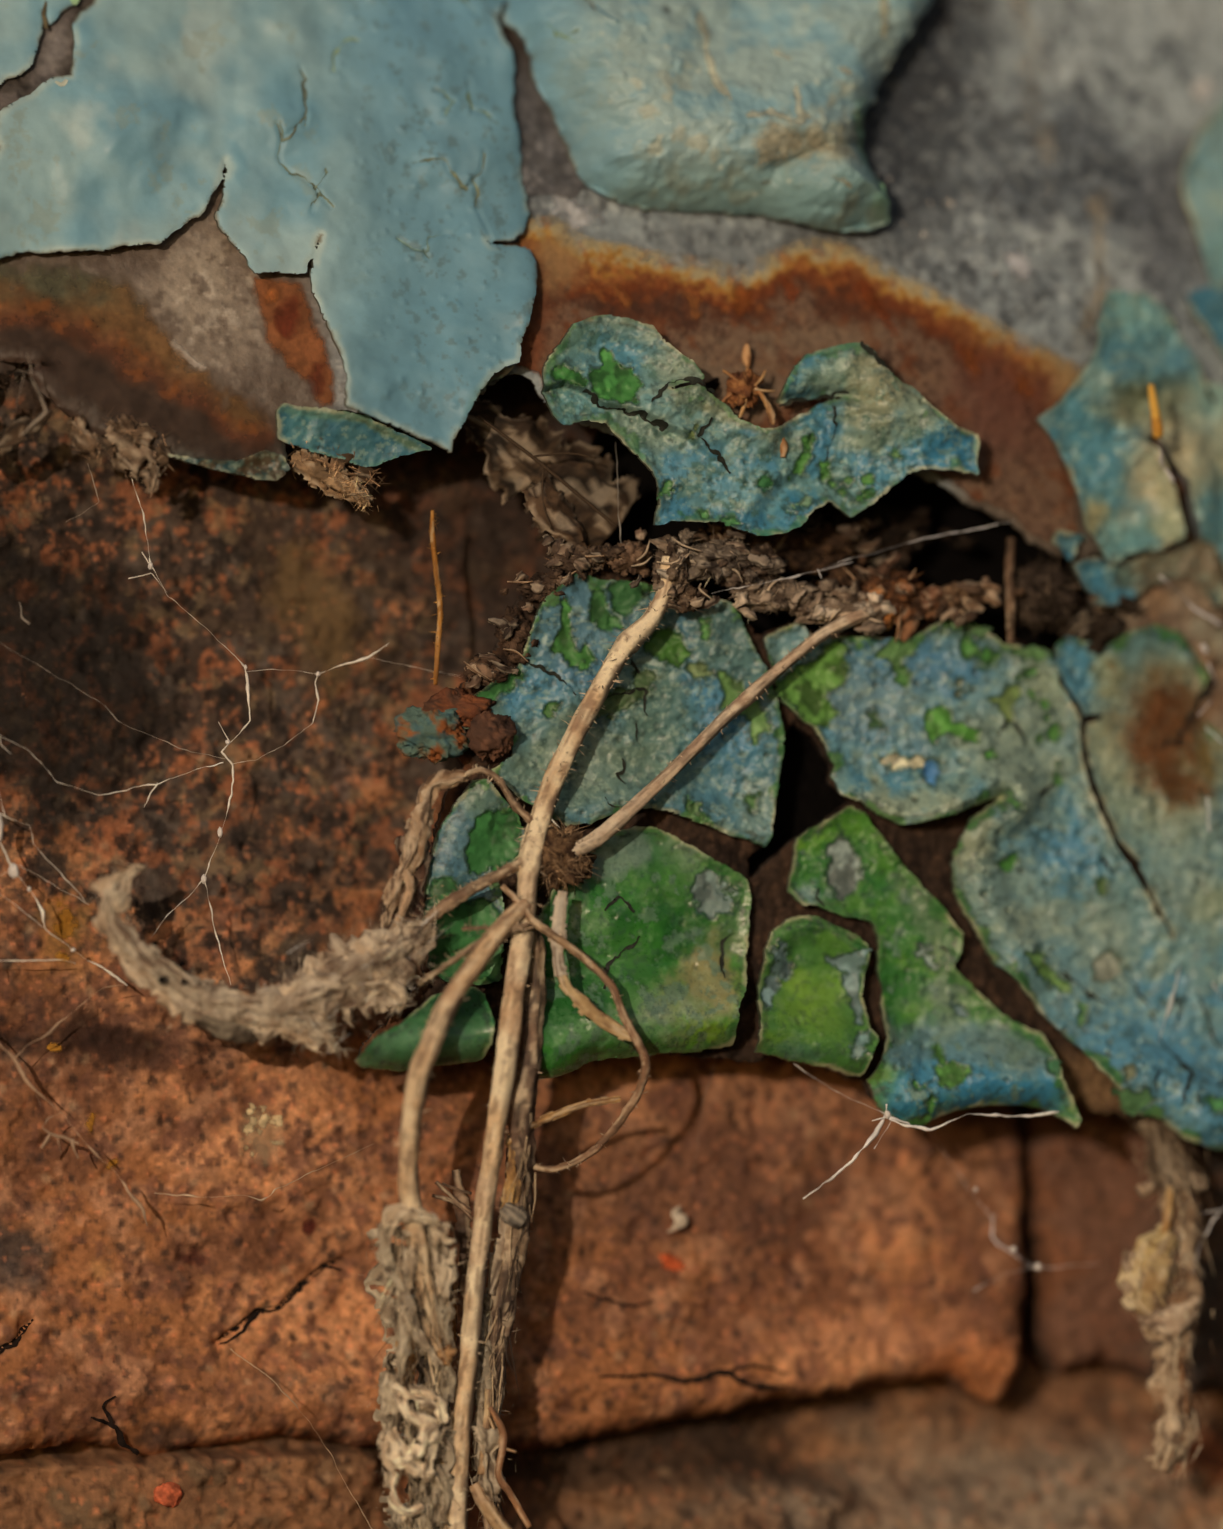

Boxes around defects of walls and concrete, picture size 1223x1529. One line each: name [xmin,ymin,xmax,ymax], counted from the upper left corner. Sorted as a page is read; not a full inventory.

crack [0,0,93,110]
crack [415,0,619,208]
corrosion [0,266,274,461]
corrosion [254,277,333,405]
peeling [0,0,932,481]
crack [492,239,521,247]
corrosion [516,219,1079,549]
peeling [1180,102,1223,358]
peeling [354,289,1223,1150]